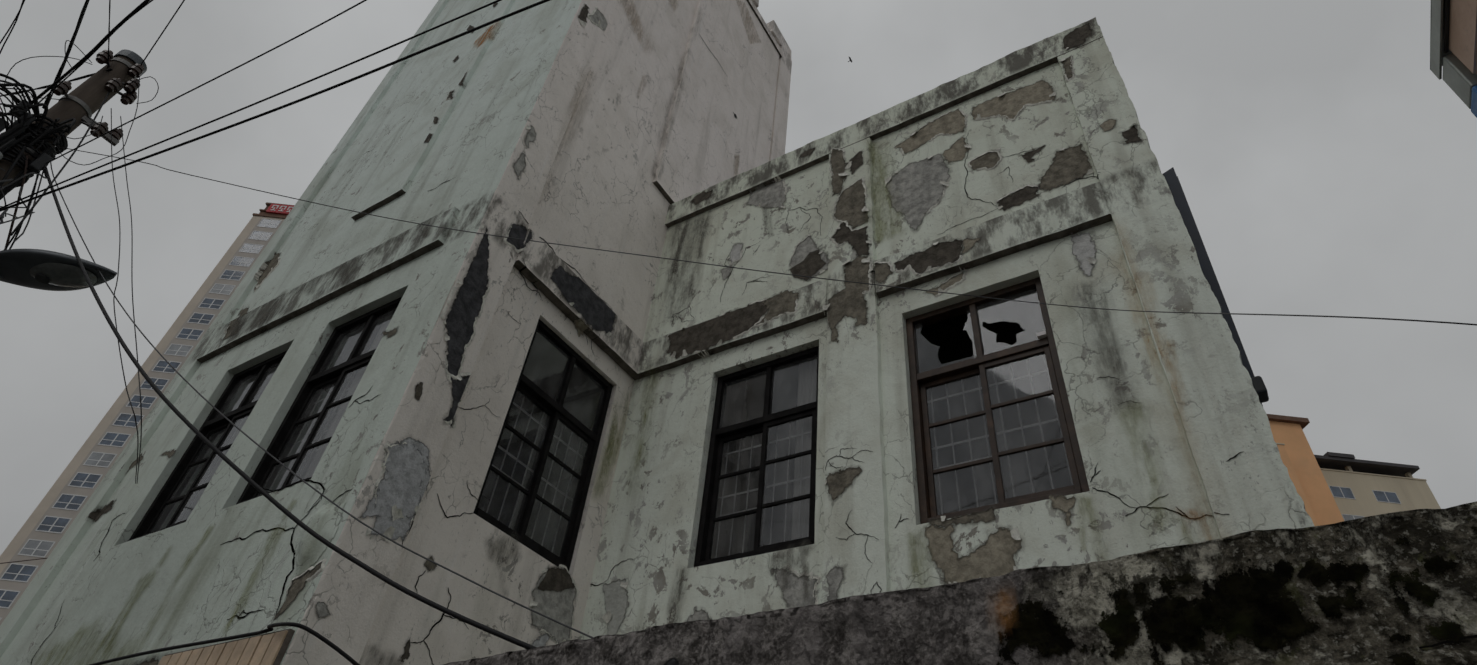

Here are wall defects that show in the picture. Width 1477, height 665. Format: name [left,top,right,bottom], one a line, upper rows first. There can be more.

peeling [885,23,1093,230]
spalling [1100,119,1142,144]
spalling [666,148,981,359]
peeling [1071,233,1098,276]
spalling [440,224,532,429]
peeling [360,437,431,543]
crack [1090,463,1229,520]
crack [221,479,352,620]
crack [402,482,478,665]
peeling [526,564,578,650]
peeling [925,507,1022,584]
crack [1419,635,1477,649]